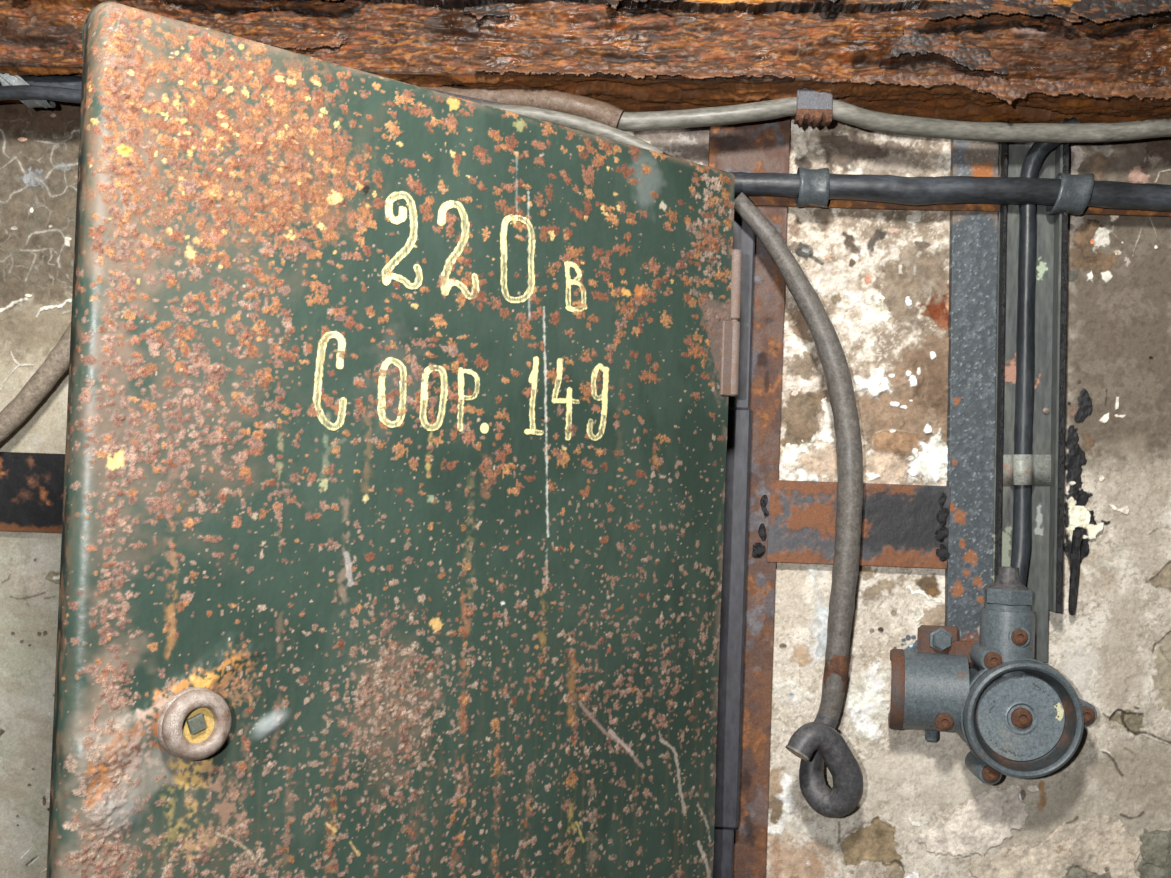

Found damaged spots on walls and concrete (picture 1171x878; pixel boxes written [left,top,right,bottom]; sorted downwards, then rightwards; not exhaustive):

spalling [1100,397,1126,423]
peeling [1081,550,1133,582]
spalling [838,816,921,878]
peeling [908,781,1171,878]